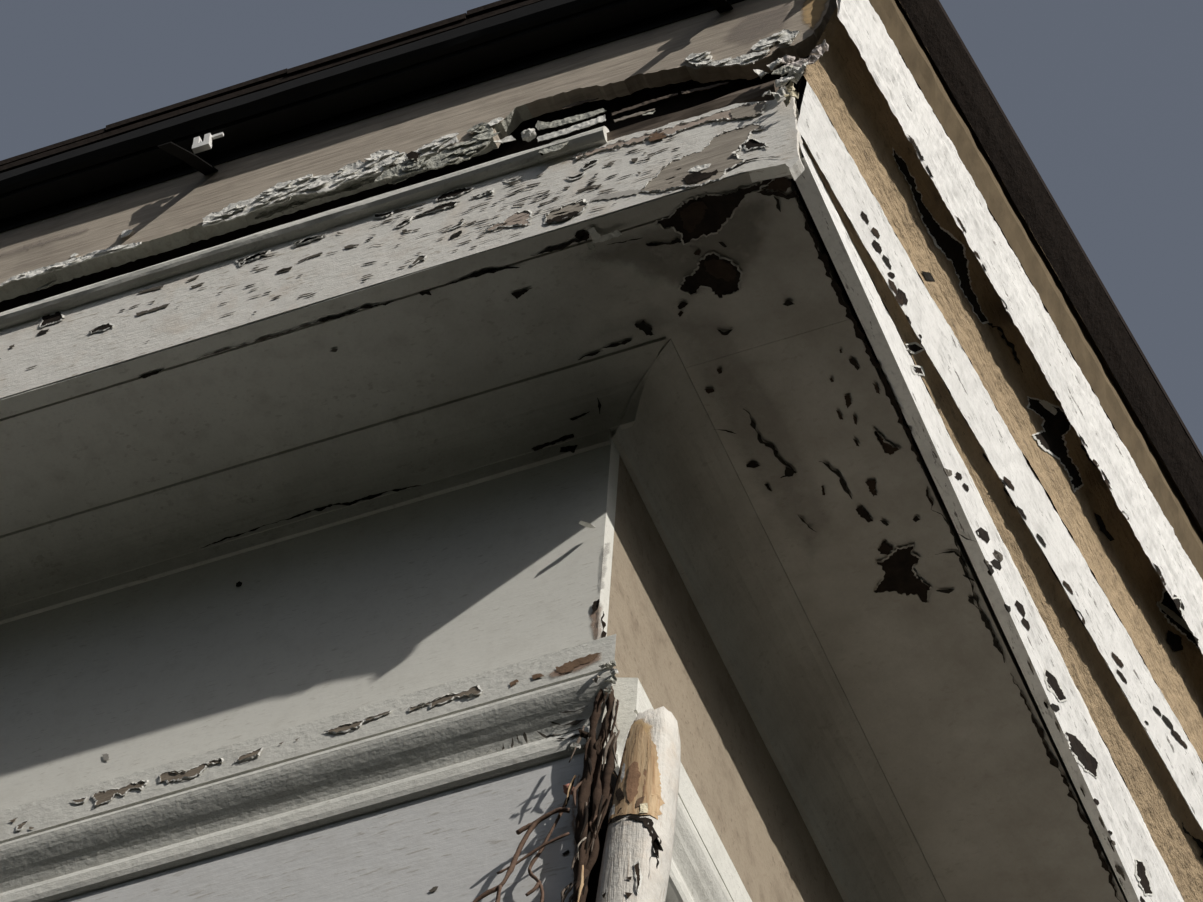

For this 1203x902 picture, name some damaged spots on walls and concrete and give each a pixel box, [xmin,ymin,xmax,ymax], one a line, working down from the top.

peeling [120,286,179,316]
peeling [187,29,829,316]